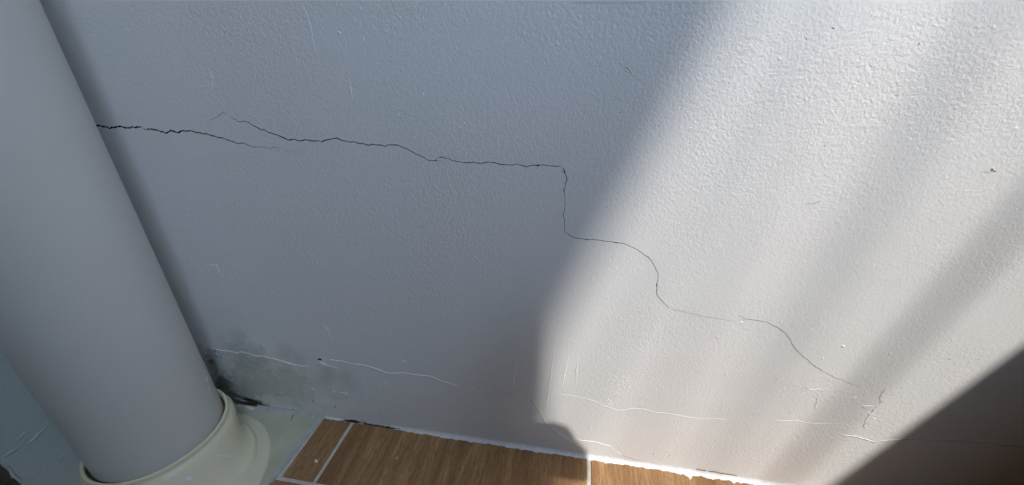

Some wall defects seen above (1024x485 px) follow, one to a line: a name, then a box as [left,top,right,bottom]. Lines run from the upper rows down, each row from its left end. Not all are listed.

crack [96,112,859,396]